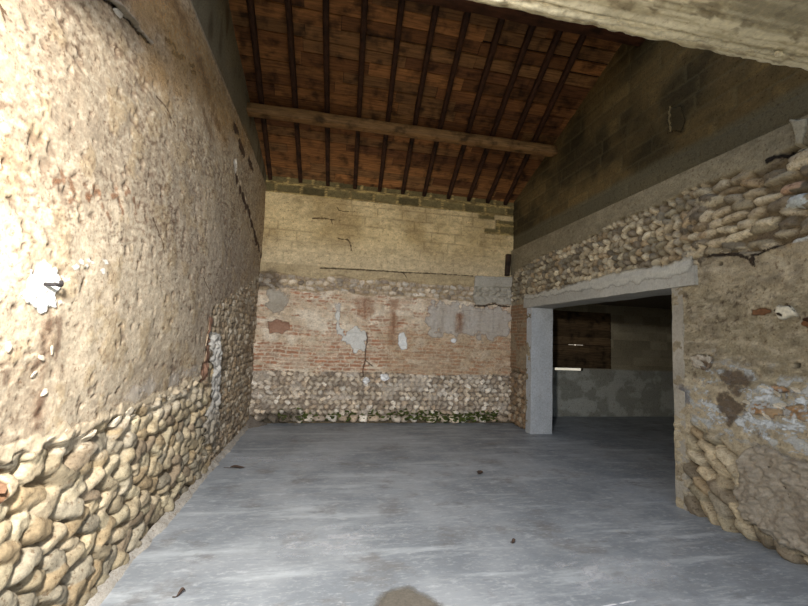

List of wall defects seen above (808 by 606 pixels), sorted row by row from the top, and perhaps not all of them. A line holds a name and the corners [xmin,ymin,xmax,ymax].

crack [233,159,262,258]
flaking render [265,288,290,334]
flaking render [425,300,512,341]
flaking render [0,316,213,465]
leakage [680,366,808,455]
spalling [0,481,9,504]